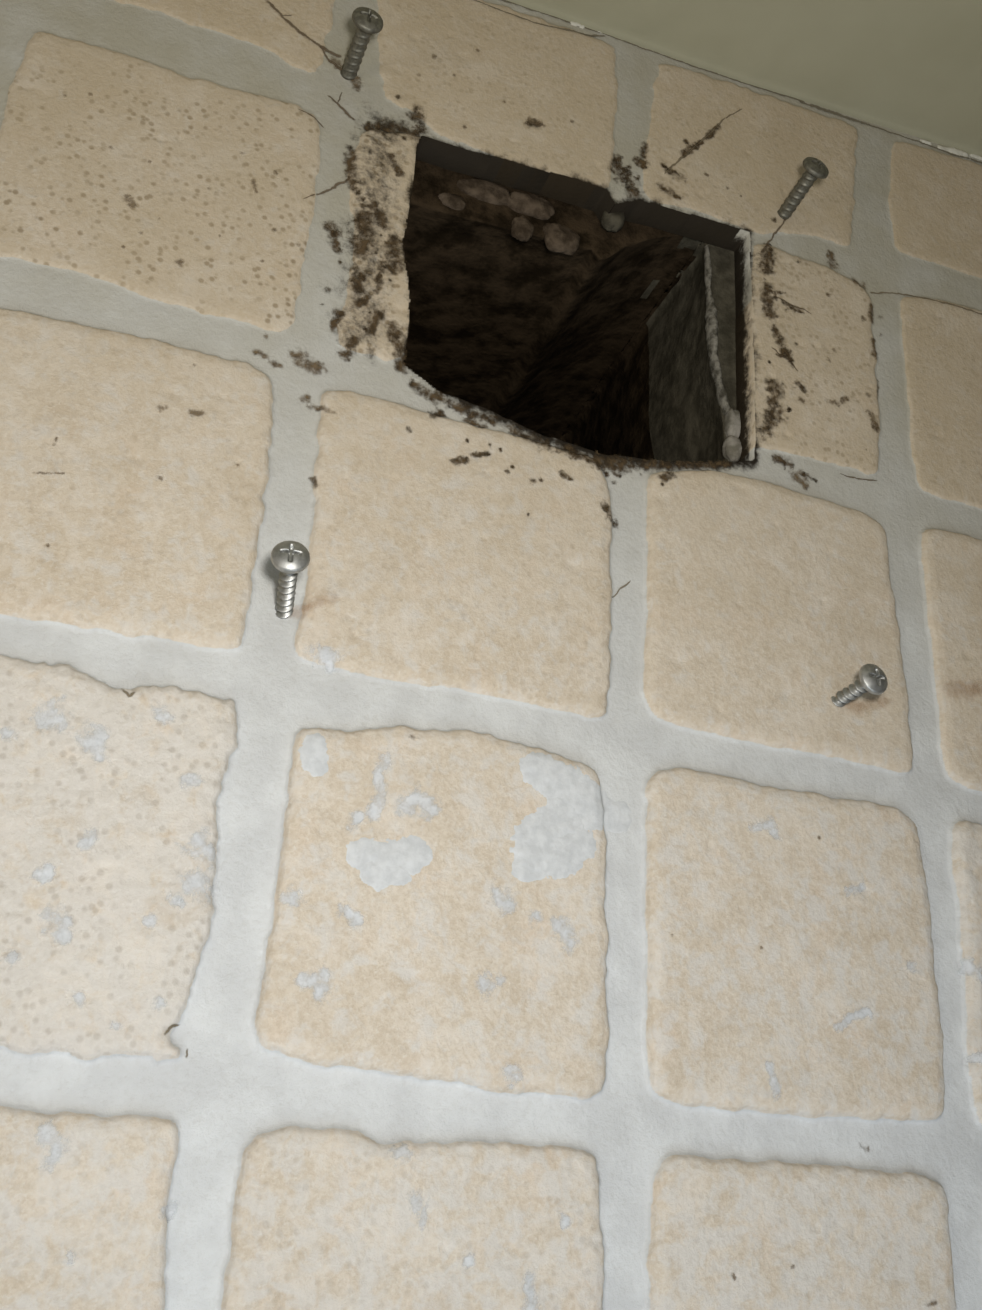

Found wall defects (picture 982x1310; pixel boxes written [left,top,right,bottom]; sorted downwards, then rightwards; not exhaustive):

spalling [346,754,441,892]
spalling [509,751,632,882]